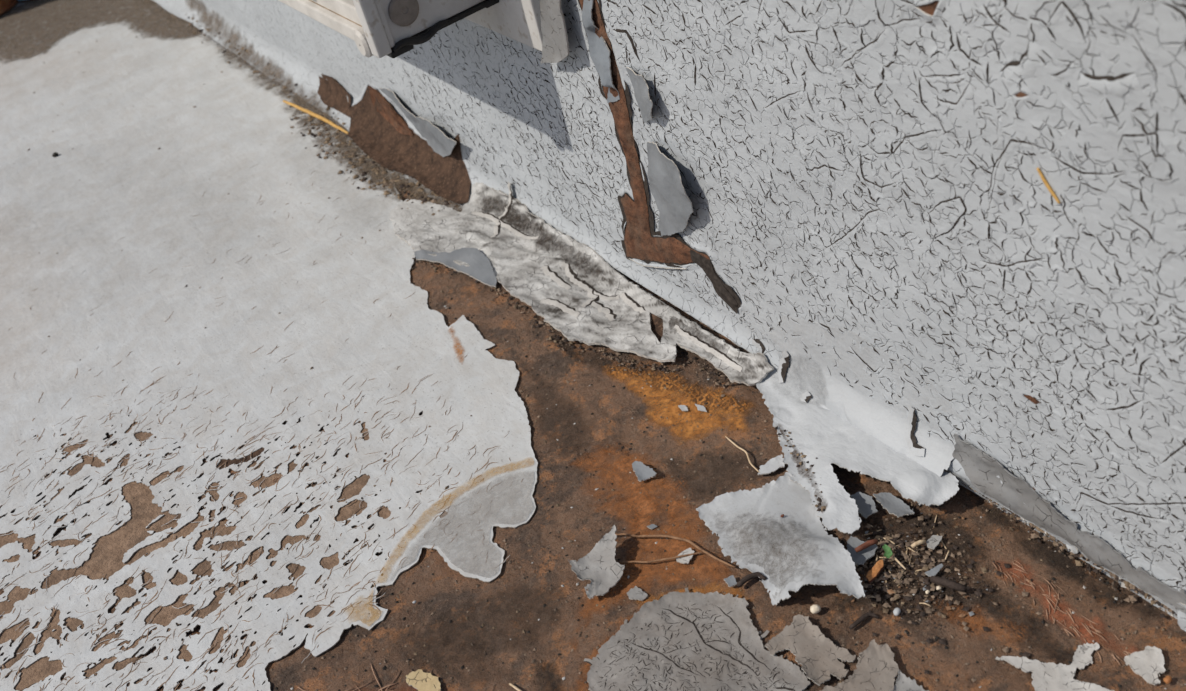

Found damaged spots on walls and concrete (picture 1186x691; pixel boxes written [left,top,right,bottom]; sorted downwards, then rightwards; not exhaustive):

water stain [0,0,462,212]
peeling [316,72,475,209]
crack [388,0,1186,591]
corrosion [607,367,750,439]
peeling [0,422,391,691]
crack [0,324,523,691]
corrosion [575,449,741,617]
crack [584,588,810,691]
peeling [568,316,975,691]
peeling [995,640,1114,691]
corrosion [1006,564,1110,644]
peeling [1124,646,1166,685]